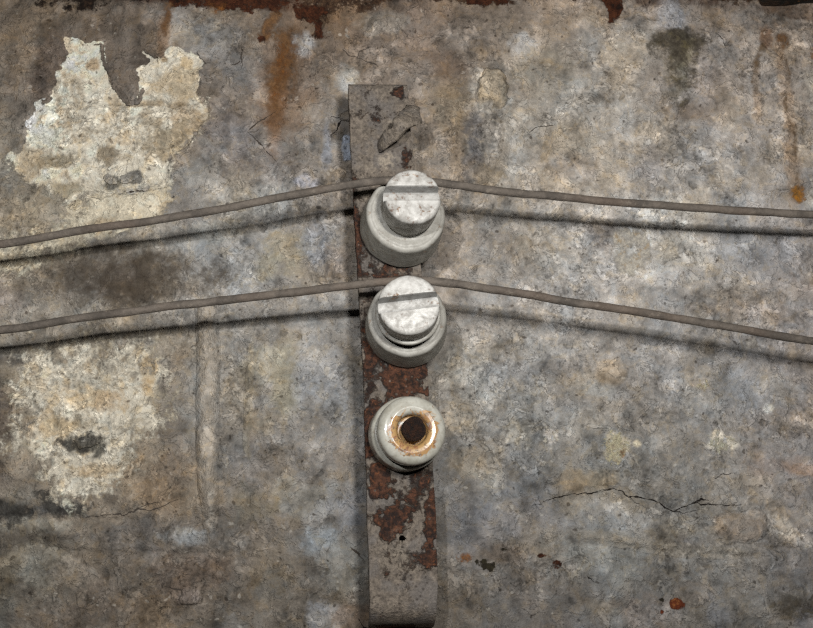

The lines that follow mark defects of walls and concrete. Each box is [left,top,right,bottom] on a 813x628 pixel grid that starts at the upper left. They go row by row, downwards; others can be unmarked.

rust [602,0,624,23]
rust [162,0,394,118]
flaking render [0,37,215,277]
crack [534,488,742,514]
rust [659,598,685,614]